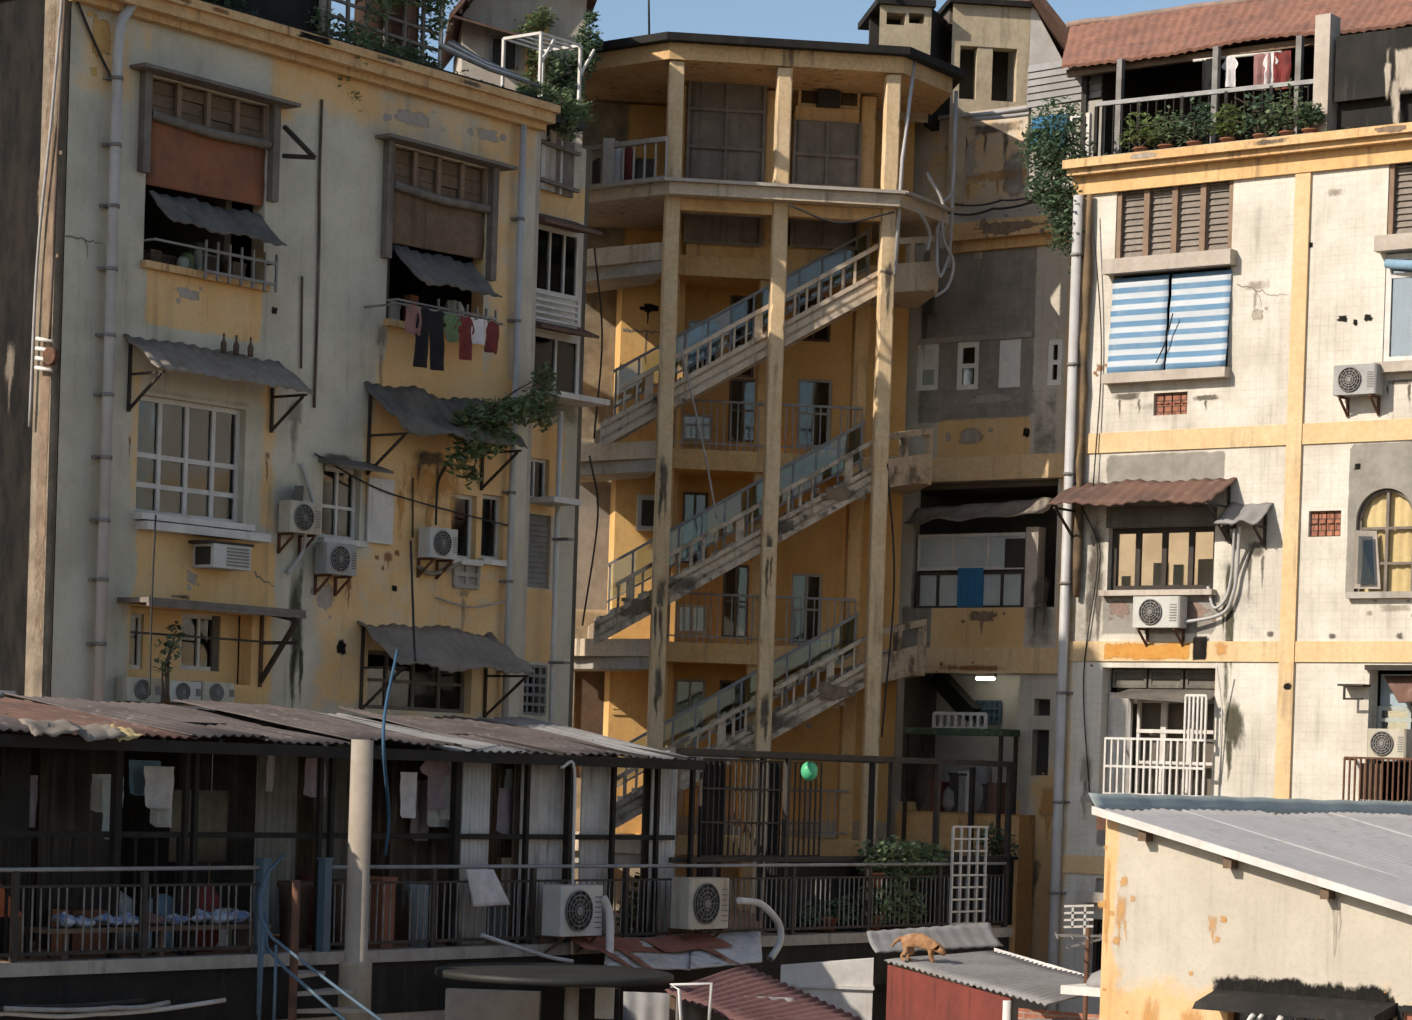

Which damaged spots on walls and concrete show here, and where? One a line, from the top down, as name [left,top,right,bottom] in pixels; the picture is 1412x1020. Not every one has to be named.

peeling [1384,48,1412,124]
damp [965,123,1019,158]
damp [290,574,303,699]
damp [1222,542,1264,641]
damp [1224,662,1244,775]
damp [1098,871,1134,944]